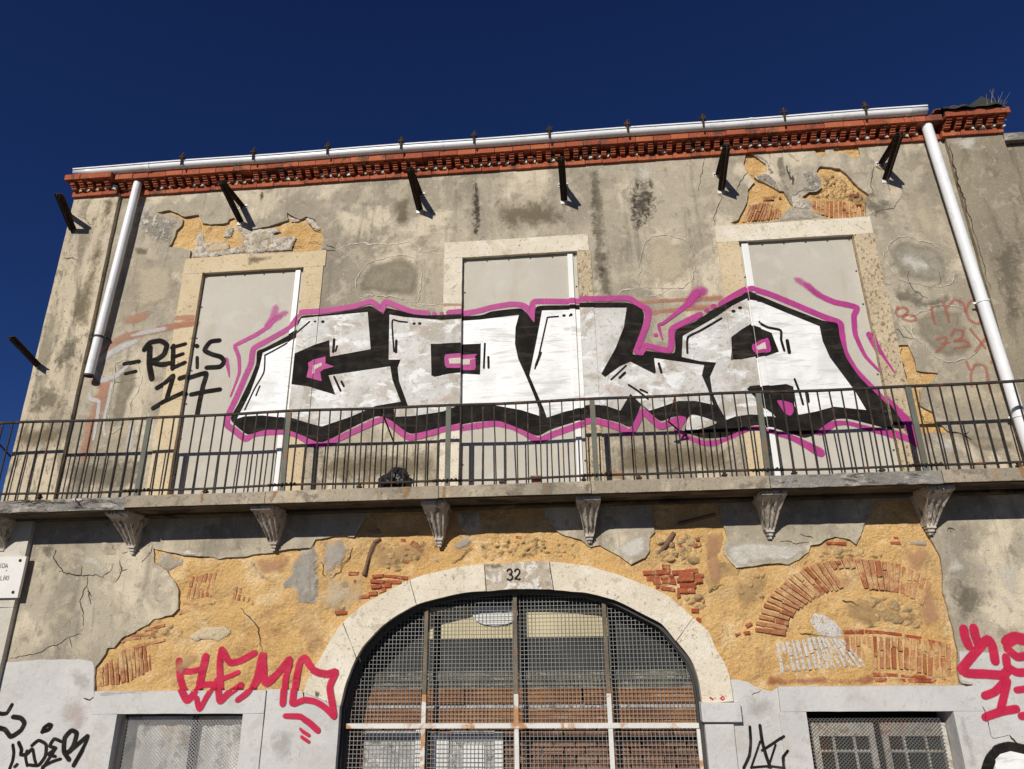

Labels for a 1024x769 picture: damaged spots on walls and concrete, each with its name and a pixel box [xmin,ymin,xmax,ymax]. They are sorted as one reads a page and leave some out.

flaking render [140,206,323,258]
leakage [632,167,652,226]
flaking render [732,155,791,225]
flaking render [803,147,868,219]
flaking render [899,346,948,434]
crack [12,550,128,658]
flaking render [96,501,958,697]